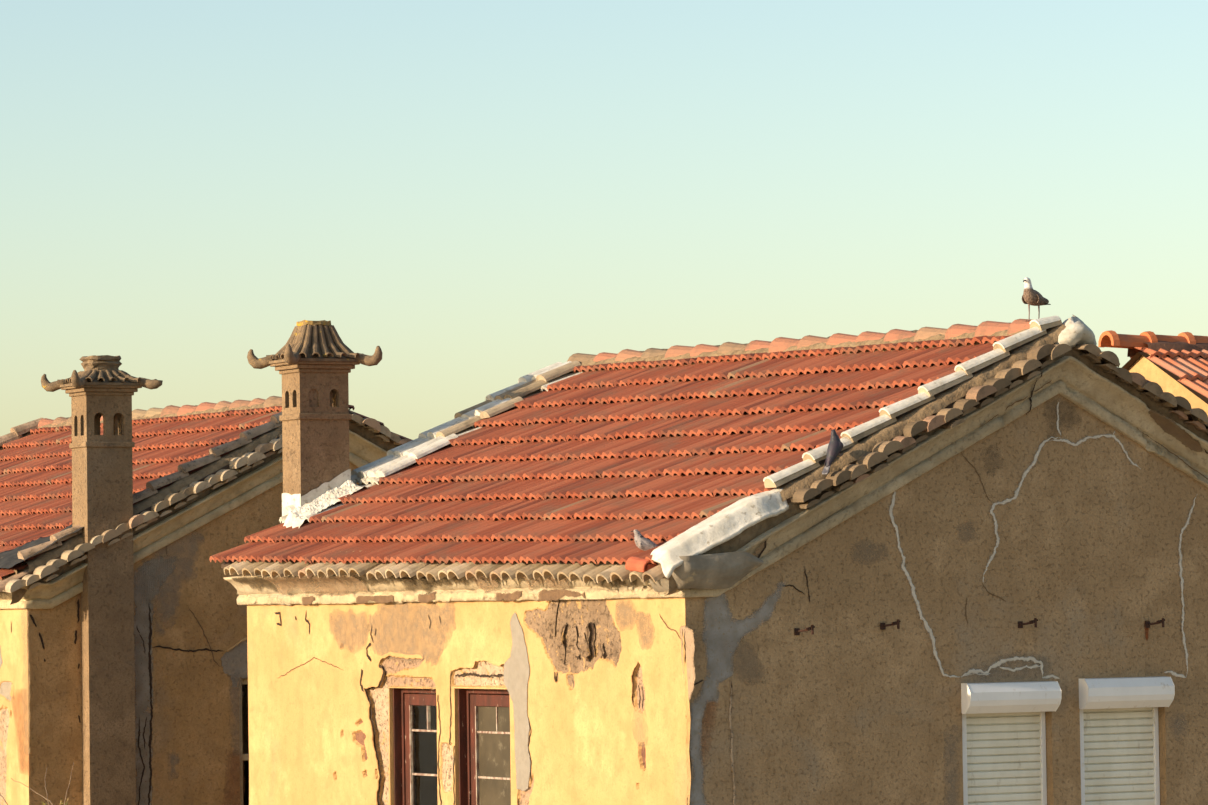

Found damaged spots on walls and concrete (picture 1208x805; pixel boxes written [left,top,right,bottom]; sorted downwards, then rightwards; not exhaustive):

spalling [0,682,14,805]
crack [137,602,221,805]
flaking render [241,575,658,690]
spalling [631,661,645,712]
peeling [680,625,695,699]
crack [889,491,1060,679]
crack [963,372,1208,678]